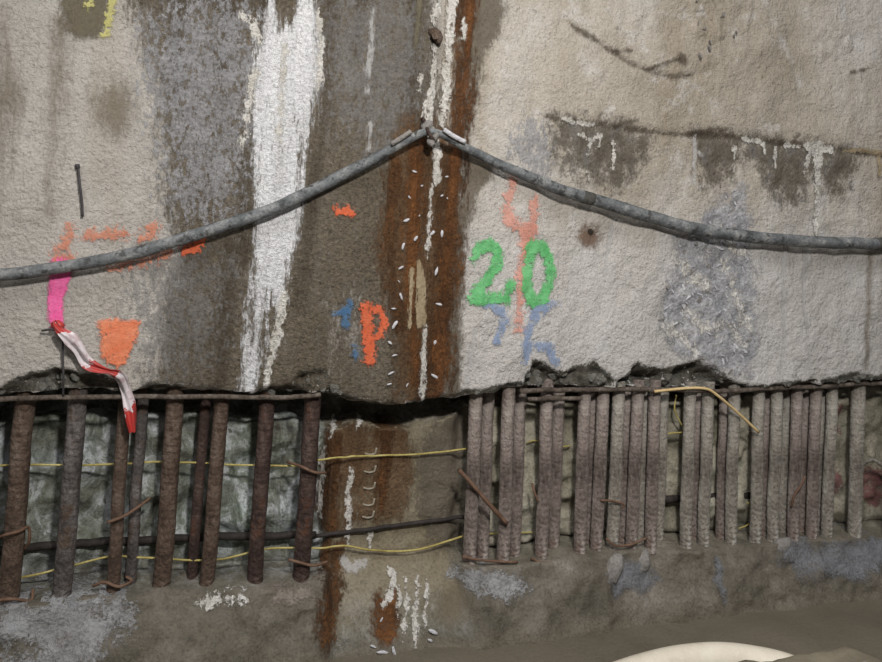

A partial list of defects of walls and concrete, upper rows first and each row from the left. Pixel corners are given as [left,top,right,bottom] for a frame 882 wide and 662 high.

water stain [59,0,109,38]
water stain [546,109,653,190]
peeling [699,181,754,230]
water stain [689,124,882,236]
water stain [123,0,533,606]
rust [314,0,480,653]
peeling [0,232,882,606]
water stain [370,566,438,655]